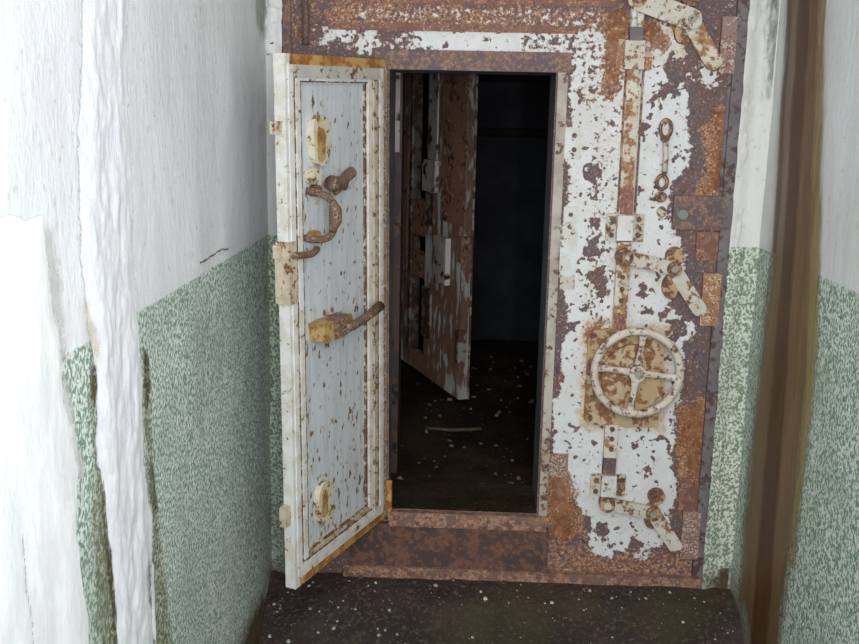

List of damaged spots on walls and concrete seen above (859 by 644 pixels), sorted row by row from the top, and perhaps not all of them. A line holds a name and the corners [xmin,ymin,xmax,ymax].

rust [598,4,630,83]
rust [643,21,671,56]
rust [702,107,725,193]
rust [583,319,610,354]
rust [675,400,705,478]
rust [547,472,579,544]